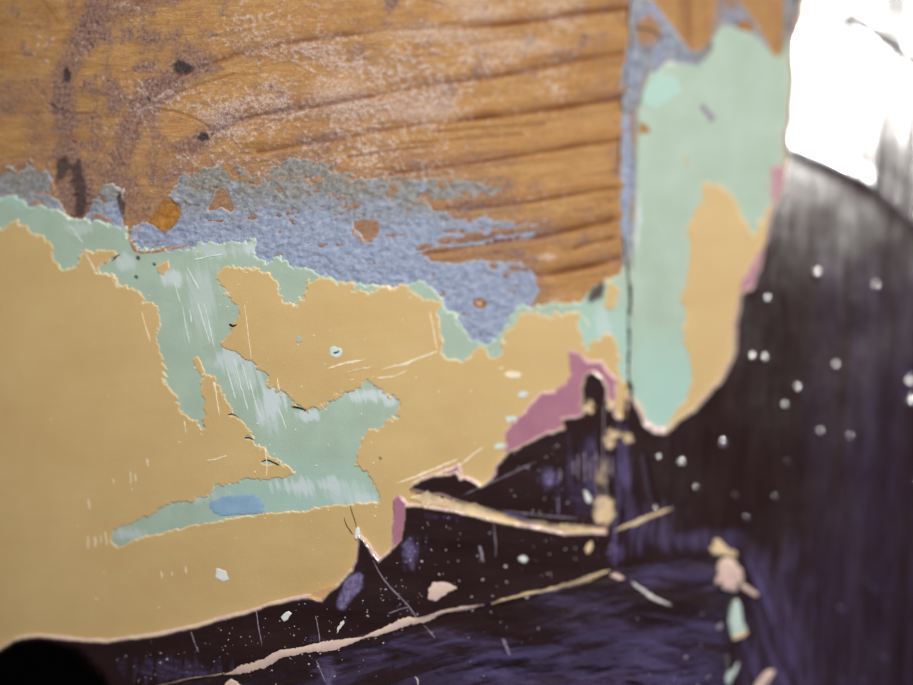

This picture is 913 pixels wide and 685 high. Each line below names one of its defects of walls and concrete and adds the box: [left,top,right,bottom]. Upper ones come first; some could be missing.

peeling [0,0,630,647]
peeling [537,508,672,554]
crack [622,235,634,433]
peeling [619,0,797,429]